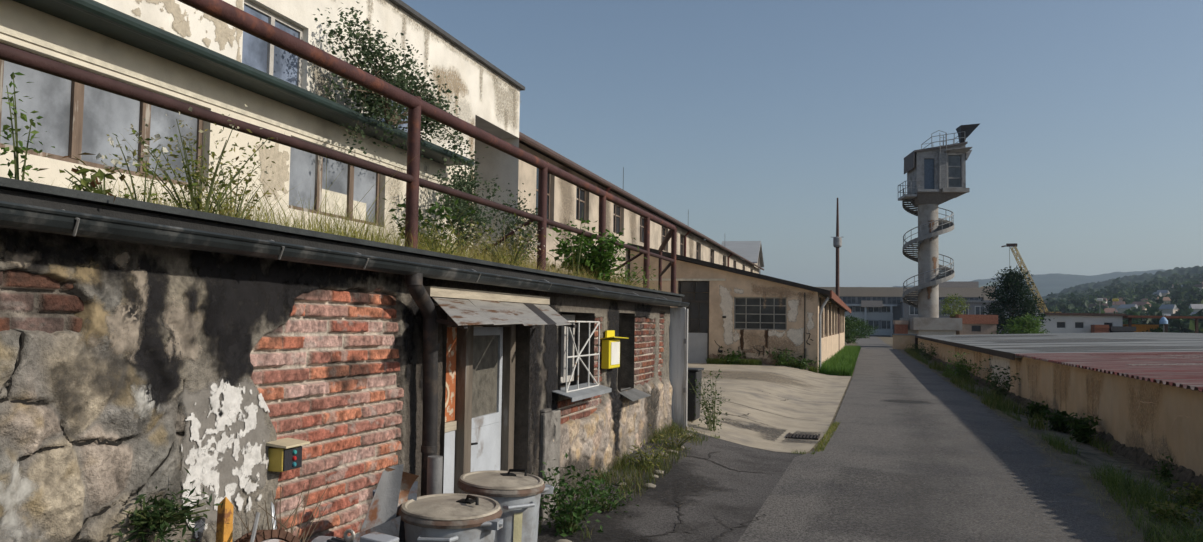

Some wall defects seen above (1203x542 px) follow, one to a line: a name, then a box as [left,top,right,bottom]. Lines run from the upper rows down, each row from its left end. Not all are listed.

peeling [132,0,242,62]
crack [0,329,134,461]
crack [71,399,186,542]
leakage [186,285,250,387]
flaking render [179,288,416,542]
peeling [709,285,816,368]